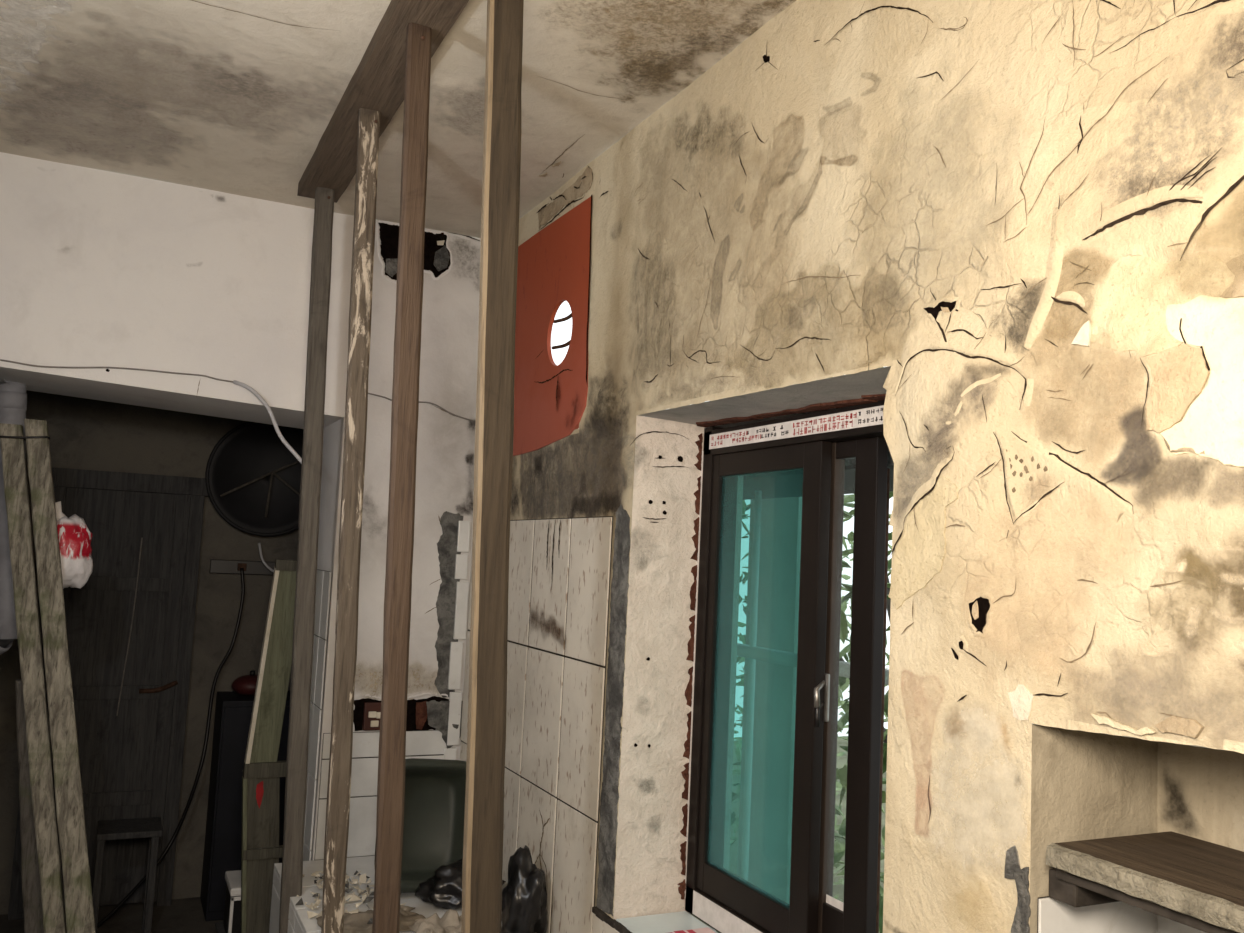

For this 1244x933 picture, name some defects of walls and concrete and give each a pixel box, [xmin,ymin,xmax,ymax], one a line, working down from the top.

crack [813,2,968,58]
crack [981,0,1244,313]
crack [644,282,830,383]
spalling [1071,181,1244,468]
crack [883,290,1133,555]
spalling [1006,449,1048,493]
leakage [1042,361,1203,500]
crack [1129,351,1149,426]
peeling [406,511,463,749]
crack [1035,623,1096,697]
leakage [1178,547,1244,614]
spalling [353,691,382,731]